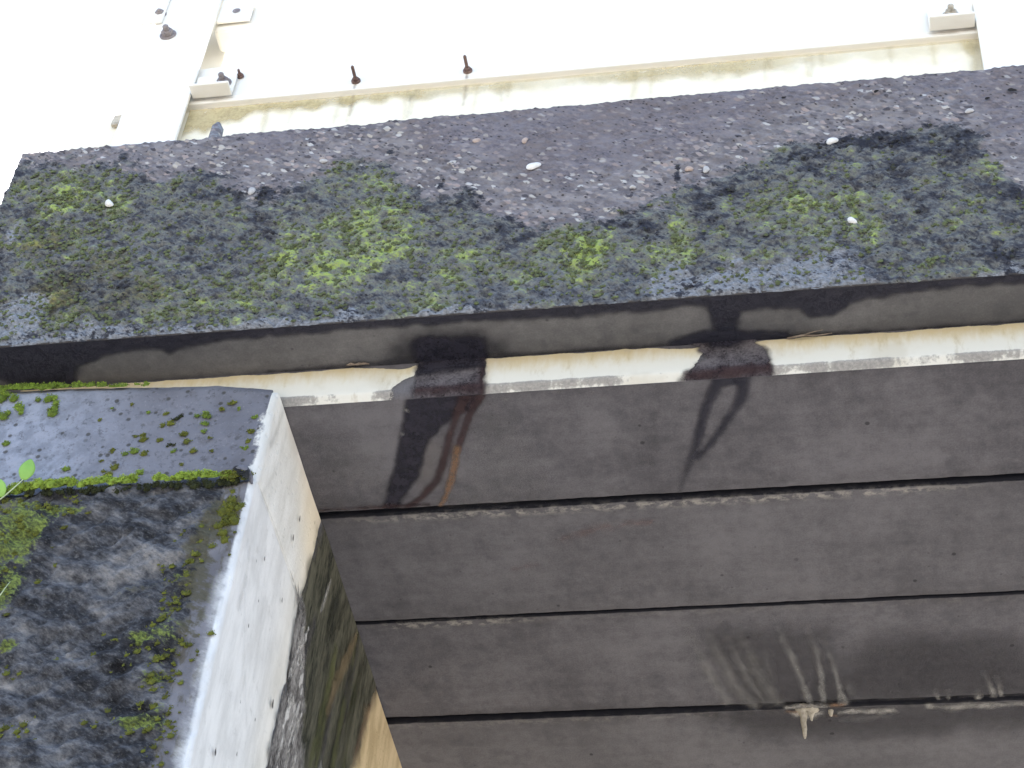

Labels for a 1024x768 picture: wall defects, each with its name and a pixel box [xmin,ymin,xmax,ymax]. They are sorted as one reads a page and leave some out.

corrosion [358,332,506,509]
water stain [0,274,1024,468]
water stain [735,659,1024,739]